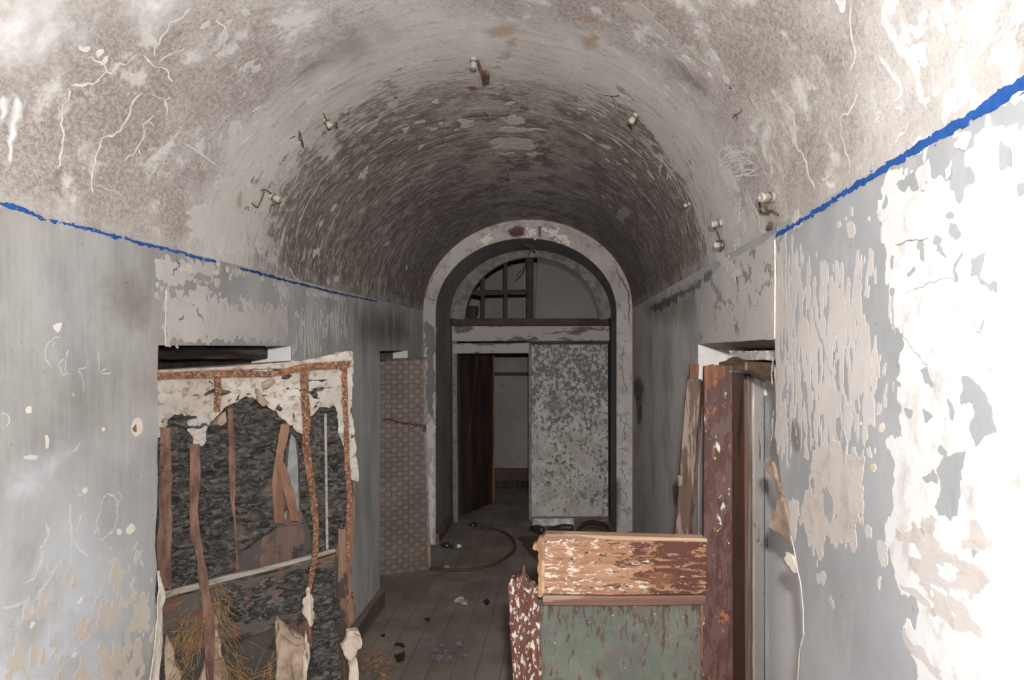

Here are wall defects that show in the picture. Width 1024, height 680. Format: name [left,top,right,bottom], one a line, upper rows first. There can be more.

peeling [455,119,474,131]
peeling [489,102,547,157]
peeling [584,134,654,197]
peeling [154,134,350,359]
peeling [524,224,571,246]
peeling [764,0,1024,680]
peeling [4,523,165,680]